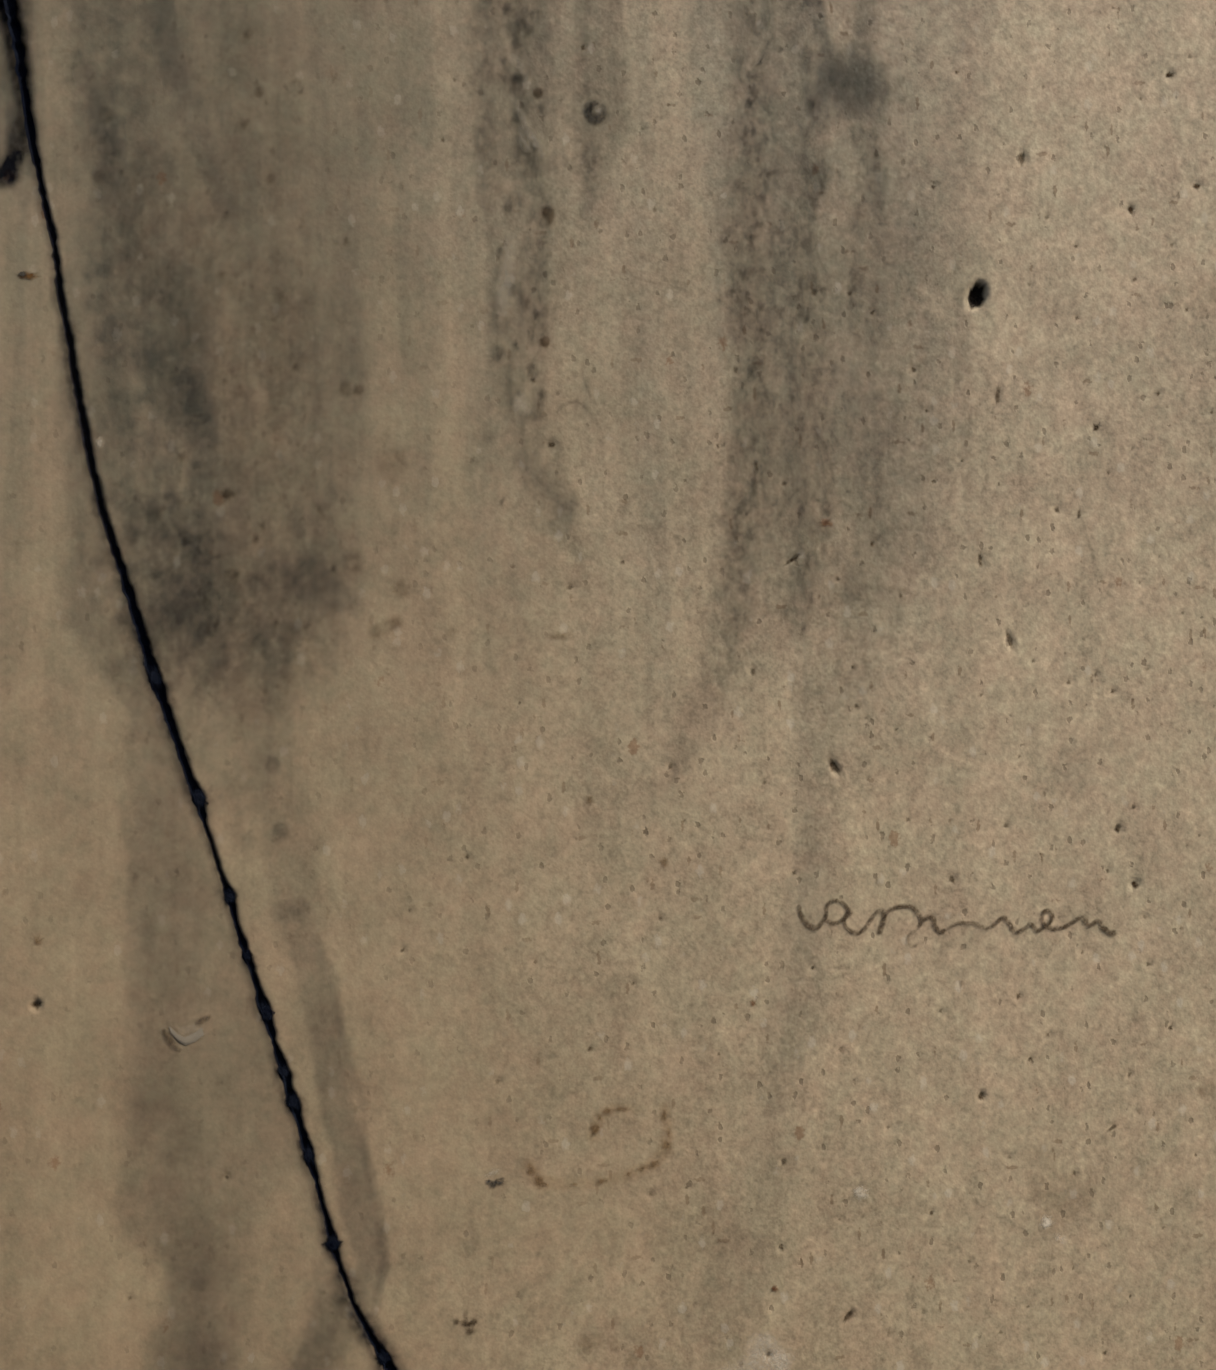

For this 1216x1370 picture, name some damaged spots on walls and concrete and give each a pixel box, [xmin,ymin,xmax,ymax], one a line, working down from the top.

crack [3,0,397,1370]